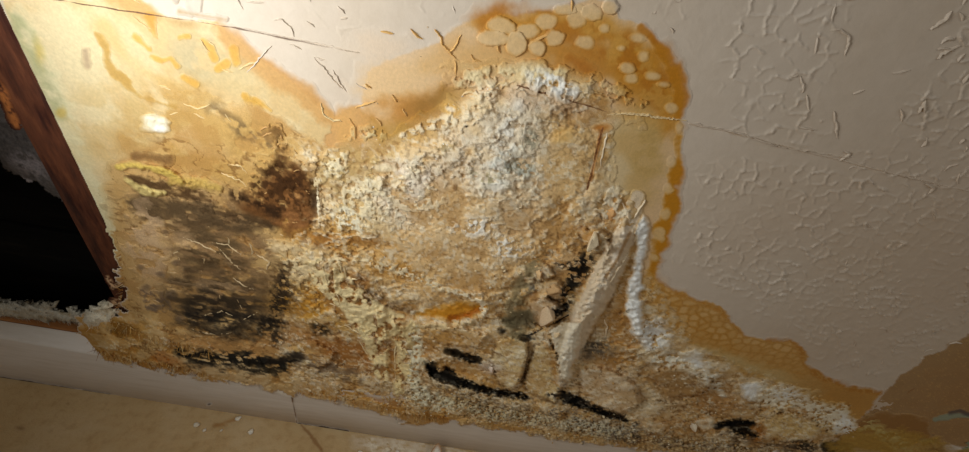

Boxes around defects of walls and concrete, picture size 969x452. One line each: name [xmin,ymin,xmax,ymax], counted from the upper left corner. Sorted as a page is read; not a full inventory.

damp [0,0,372,384]
crack [57,0,360,53]
peeling [203,0,371,92]
flaking render [56,57,861,452]
damp [320,0,969,452]
crack [516,84,969,192]
peeling [668,0,969,385]